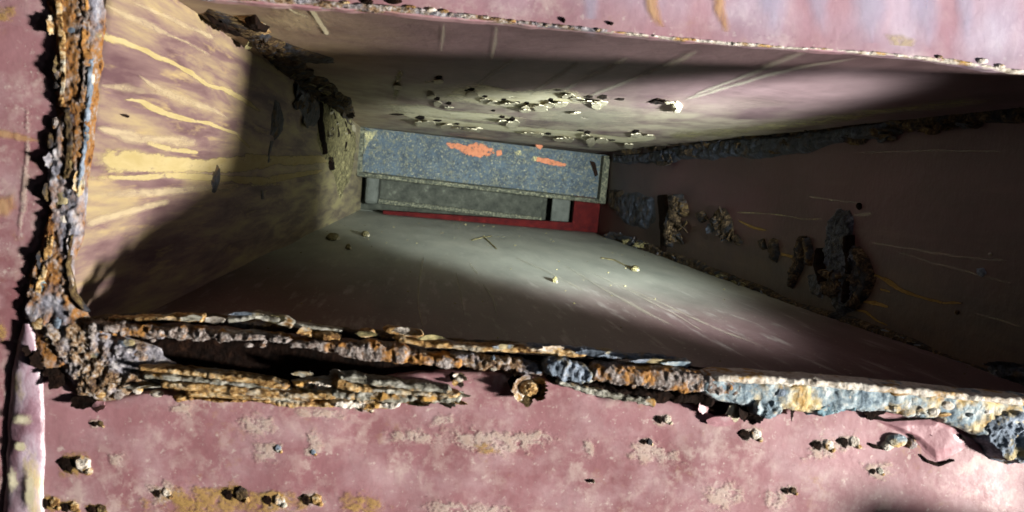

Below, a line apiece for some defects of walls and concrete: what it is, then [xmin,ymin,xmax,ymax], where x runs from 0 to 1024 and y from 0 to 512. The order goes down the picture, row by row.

spalling [203,9,355,119]
rust [23,0,259,337]
rust [99,83,356,198]
spalling [267,100,284,163]
peeling [390,75,483,132]
peeling [464,88,653,149]
spalling [608,189,744,252]
spalling [757,203,876,315]
rust [21,329,65,390]
rust [70,395,106,412]
rust [85,310,1024,465]
rust [708,481,745,510]